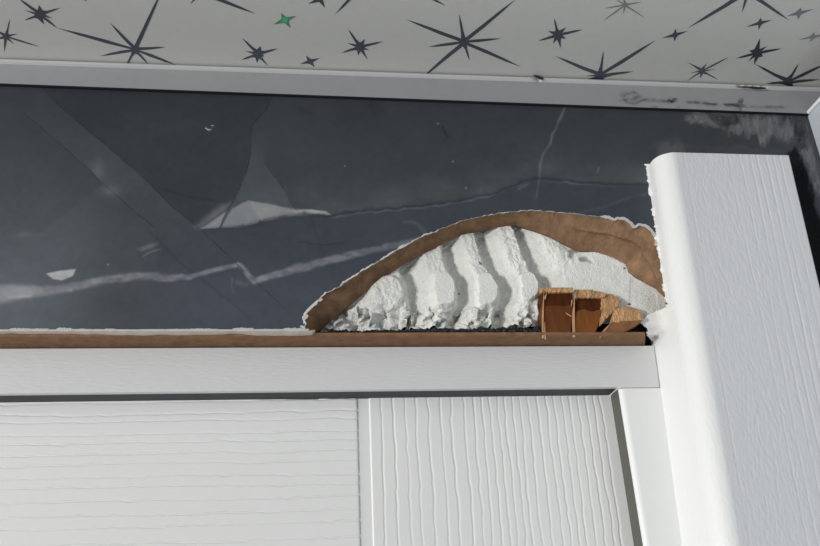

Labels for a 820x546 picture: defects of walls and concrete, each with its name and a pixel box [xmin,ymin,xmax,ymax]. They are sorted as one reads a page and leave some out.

leakage [791,116,820,195]
flaking render [300,164,673,343]